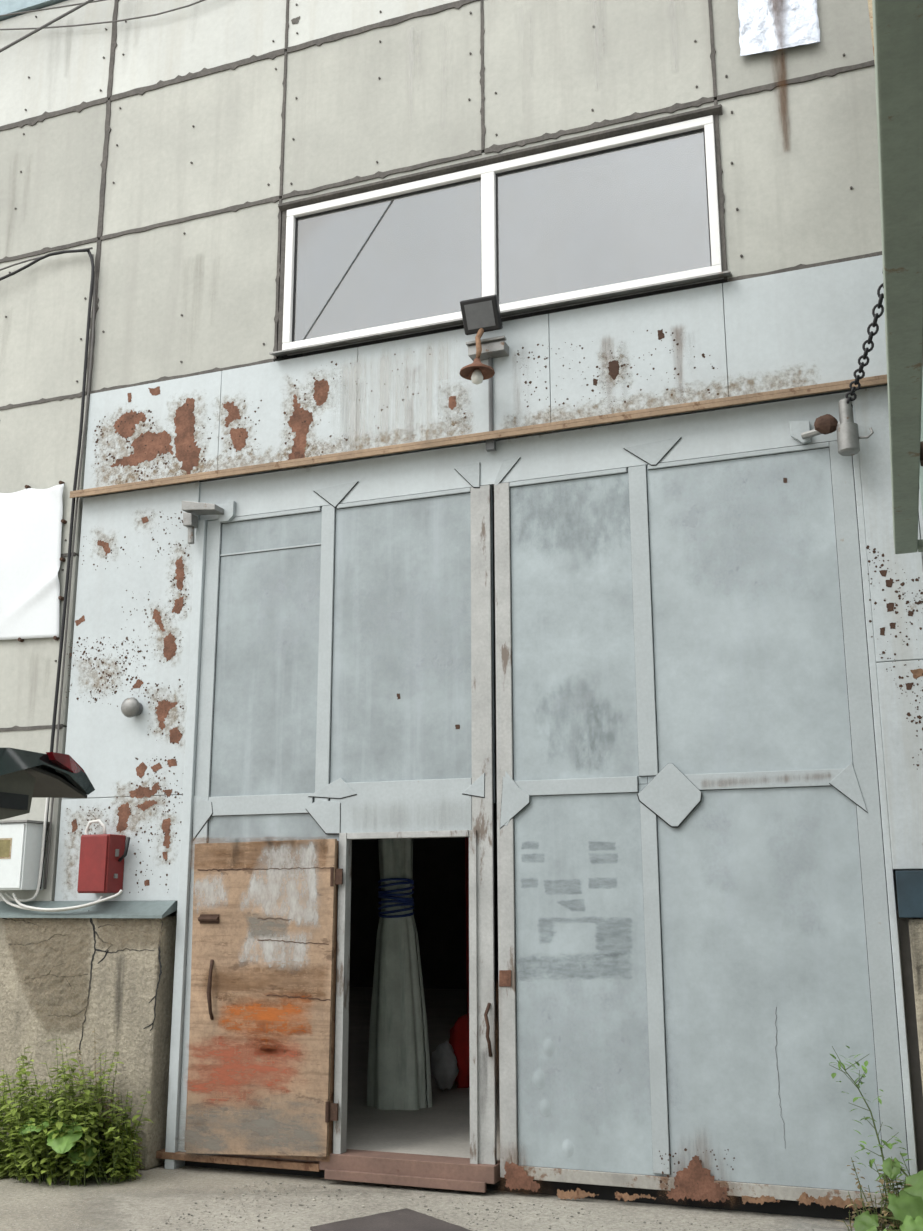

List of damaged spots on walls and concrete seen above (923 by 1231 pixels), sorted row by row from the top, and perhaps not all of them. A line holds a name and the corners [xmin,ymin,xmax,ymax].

crack [2,918,163,1054]
corrosion [504,1161,540,1192]
corrosion [615,1148,780,1205]
corrosion [557,1188,596,1200]
corrosion [796,1192,865,1211]